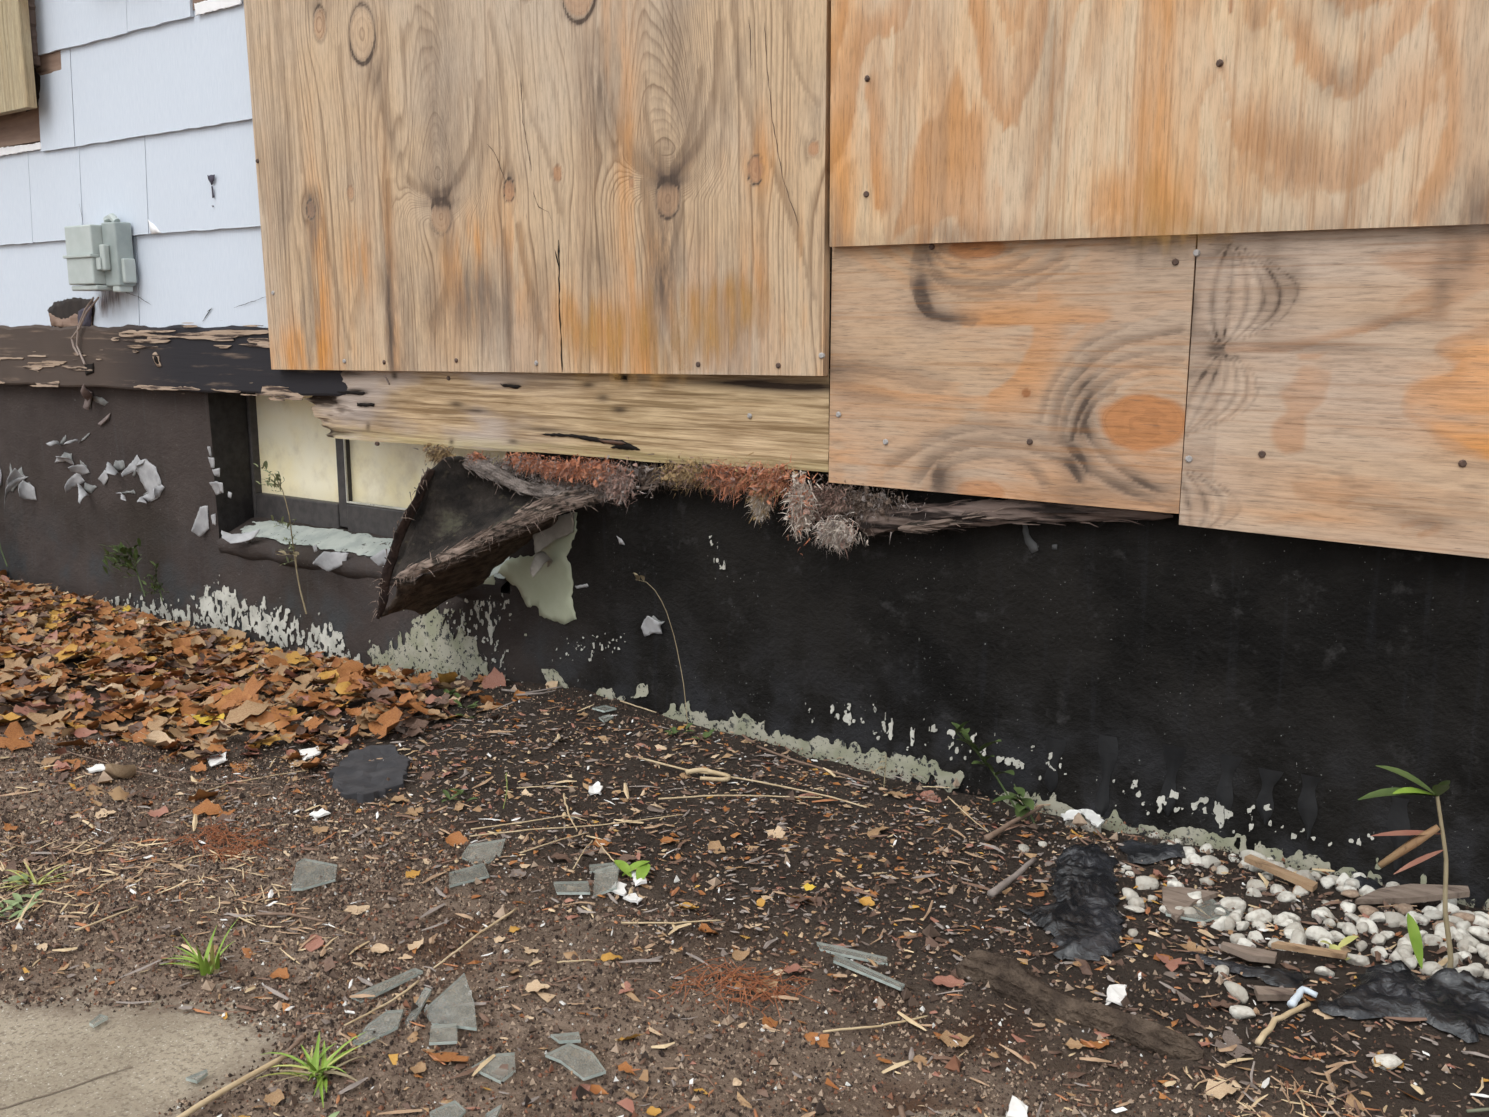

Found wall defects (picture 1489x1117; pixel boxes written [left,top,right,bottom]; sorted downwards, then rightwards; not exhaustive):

peeling [0,351,165,507]
peeling [111,322,270,353]
peeling [104,446,665,688]
peeling [662,701,1383,885]